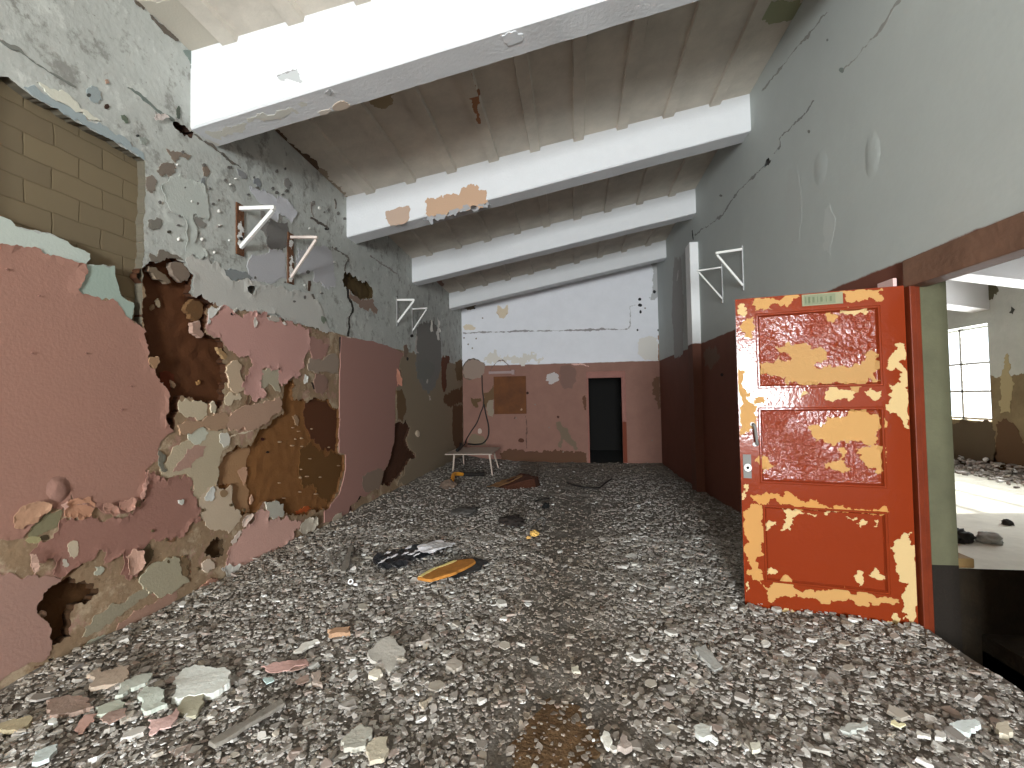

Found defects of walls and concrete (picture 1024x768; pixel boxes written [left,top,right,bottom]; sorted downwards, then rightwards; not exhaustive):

crack [843,0,902,70]
spalling [423,184,490,225]
crack [692,100,814,240]
spalling [0,76,345,577]
crack [304,199,398,352]
hole [342,271,373,300]
peeling [737,295,800,339]
peeling [825,288,884,323]
peeling [738,368,765,435]
peeling [760,342,909,474]
peeling [742,484,917,625]
spalling [37,576,99,645]